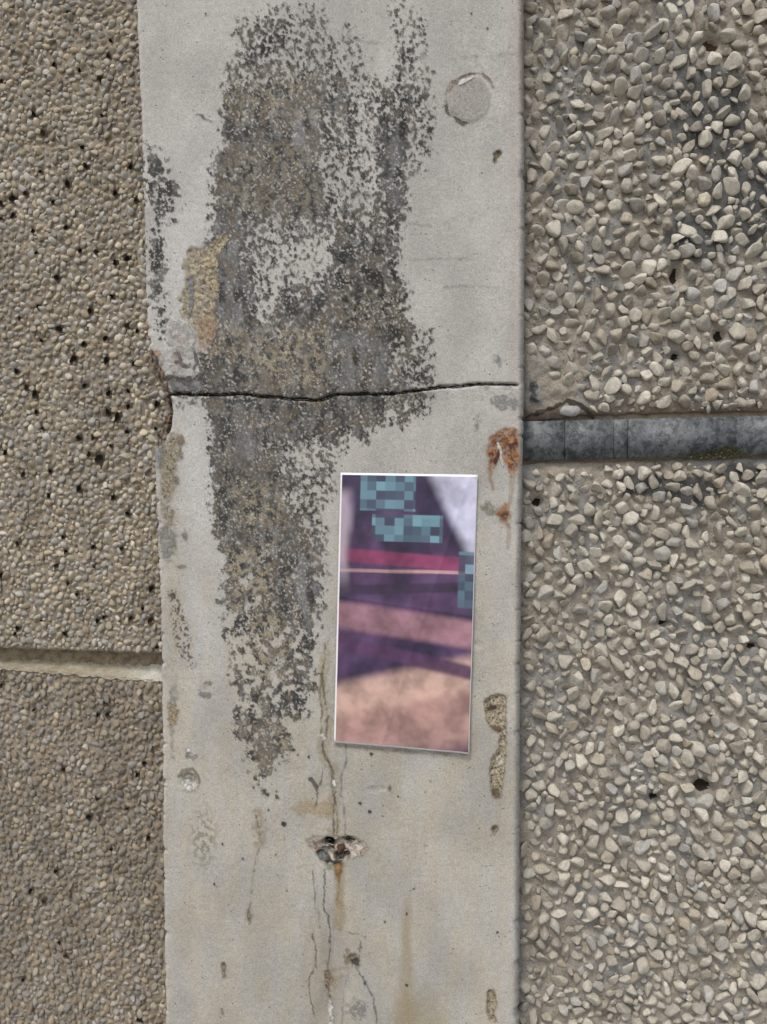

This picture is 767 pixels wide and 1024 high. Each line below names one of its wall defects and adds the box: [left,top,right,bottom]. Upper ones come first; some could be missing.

mould [139,145,186,340]
peeling [177,234,229,350]
water stain [163,0,436,799]
crack [170,381,595,430]
rust [486,427,521,481]
rust [481,503,511,524]
crack [308,645,347,836]
spalling [484,694,507,798]
crack [308,871,334,1024]
rust [326,863,343,929]
spalling [305,835,369,864]